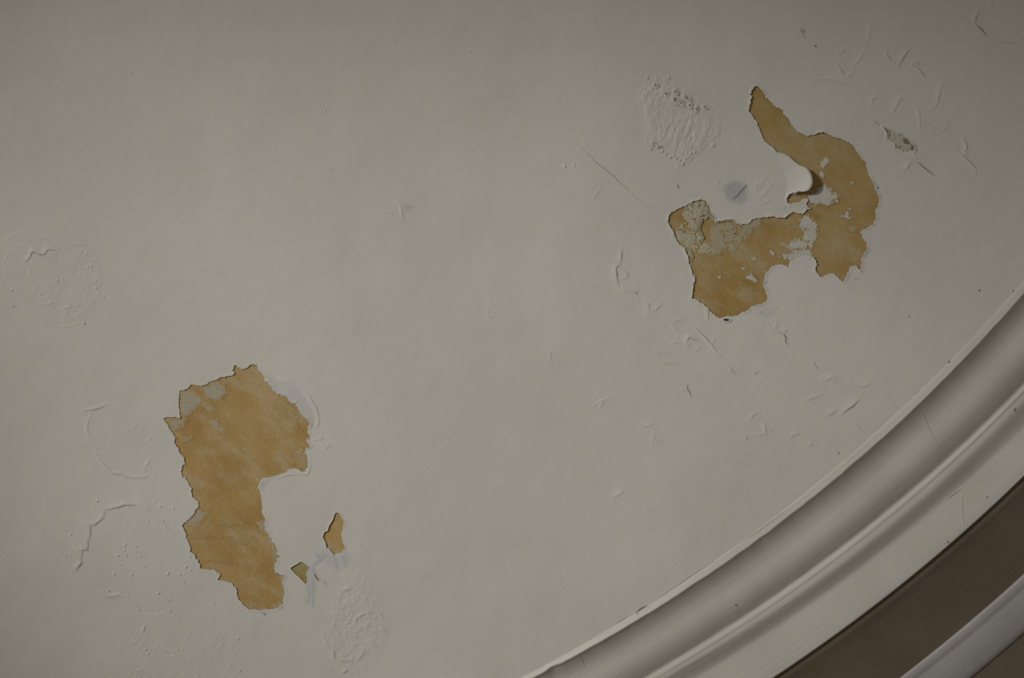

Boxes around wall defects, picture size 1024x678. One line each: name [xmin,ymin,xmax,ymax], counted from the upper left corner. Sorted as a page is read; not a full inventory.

peeling [664,82,883,322]
peeling [160,361,332,614]
peeling [321,511,347,556]